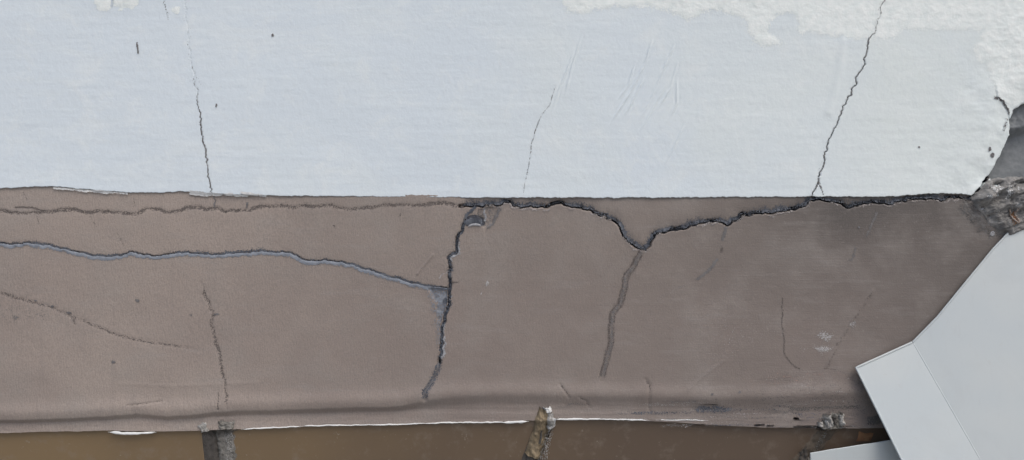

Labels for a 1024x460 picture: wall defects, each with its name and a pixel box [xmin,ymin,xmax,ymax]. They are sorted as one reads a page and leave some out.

crack [0,30,990,410]
peeling [560,0,1024,247]